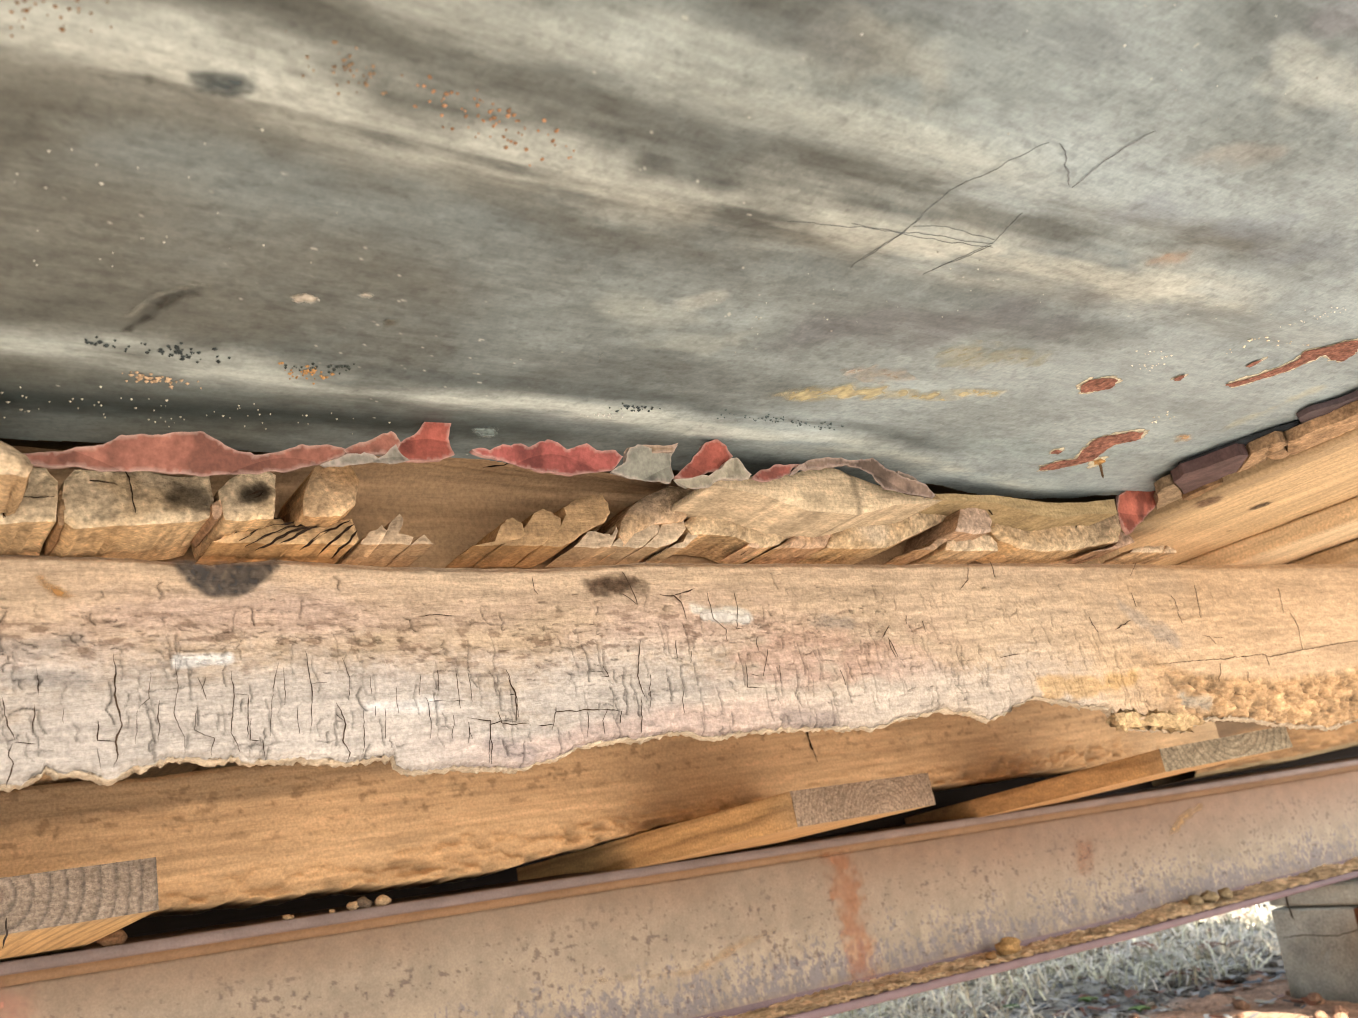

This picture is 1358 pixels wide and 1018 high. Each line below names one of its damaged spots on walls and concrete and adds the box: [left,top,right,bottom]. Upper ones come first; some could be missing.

damp [191,74,252,96]
peeling [673,439,733,479]
peeling [751,464,800,483]
crack [622,572,781,688]
crack [883,616,926,657]
crack [1149,586,1356,683]
crack [2,668,64,785]
crack [96,641,685,769]